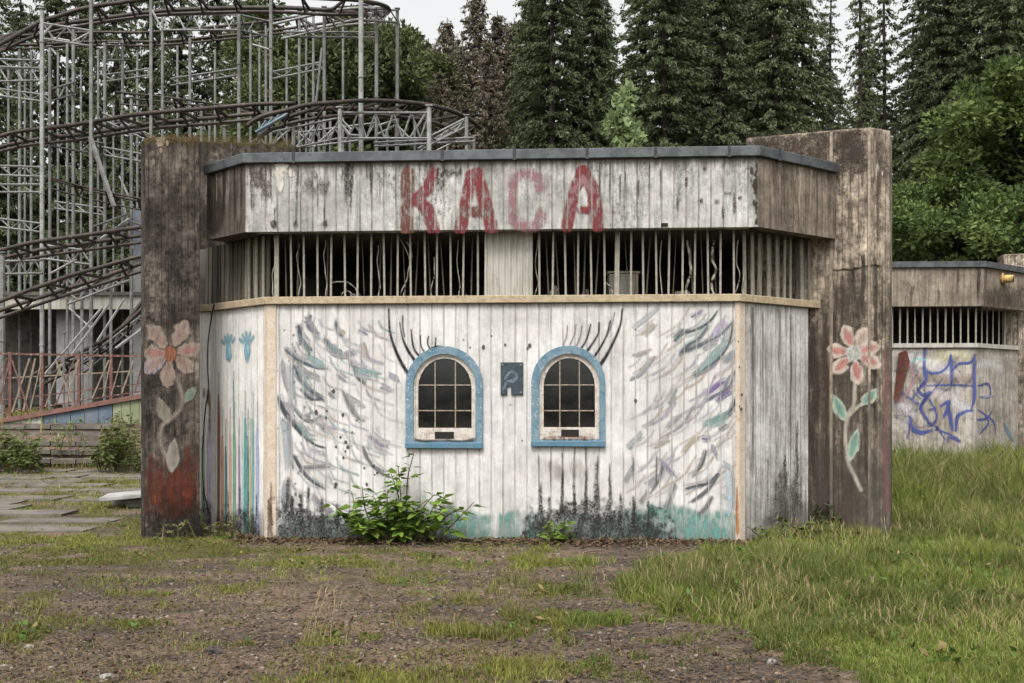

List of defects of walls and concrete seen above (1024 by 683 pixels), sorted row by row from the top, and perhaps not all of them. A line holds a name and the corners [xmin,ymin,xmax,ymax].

leakage [344,163,373,206]
leakage [751,309,764,446]
leakage [767,255,883,534]